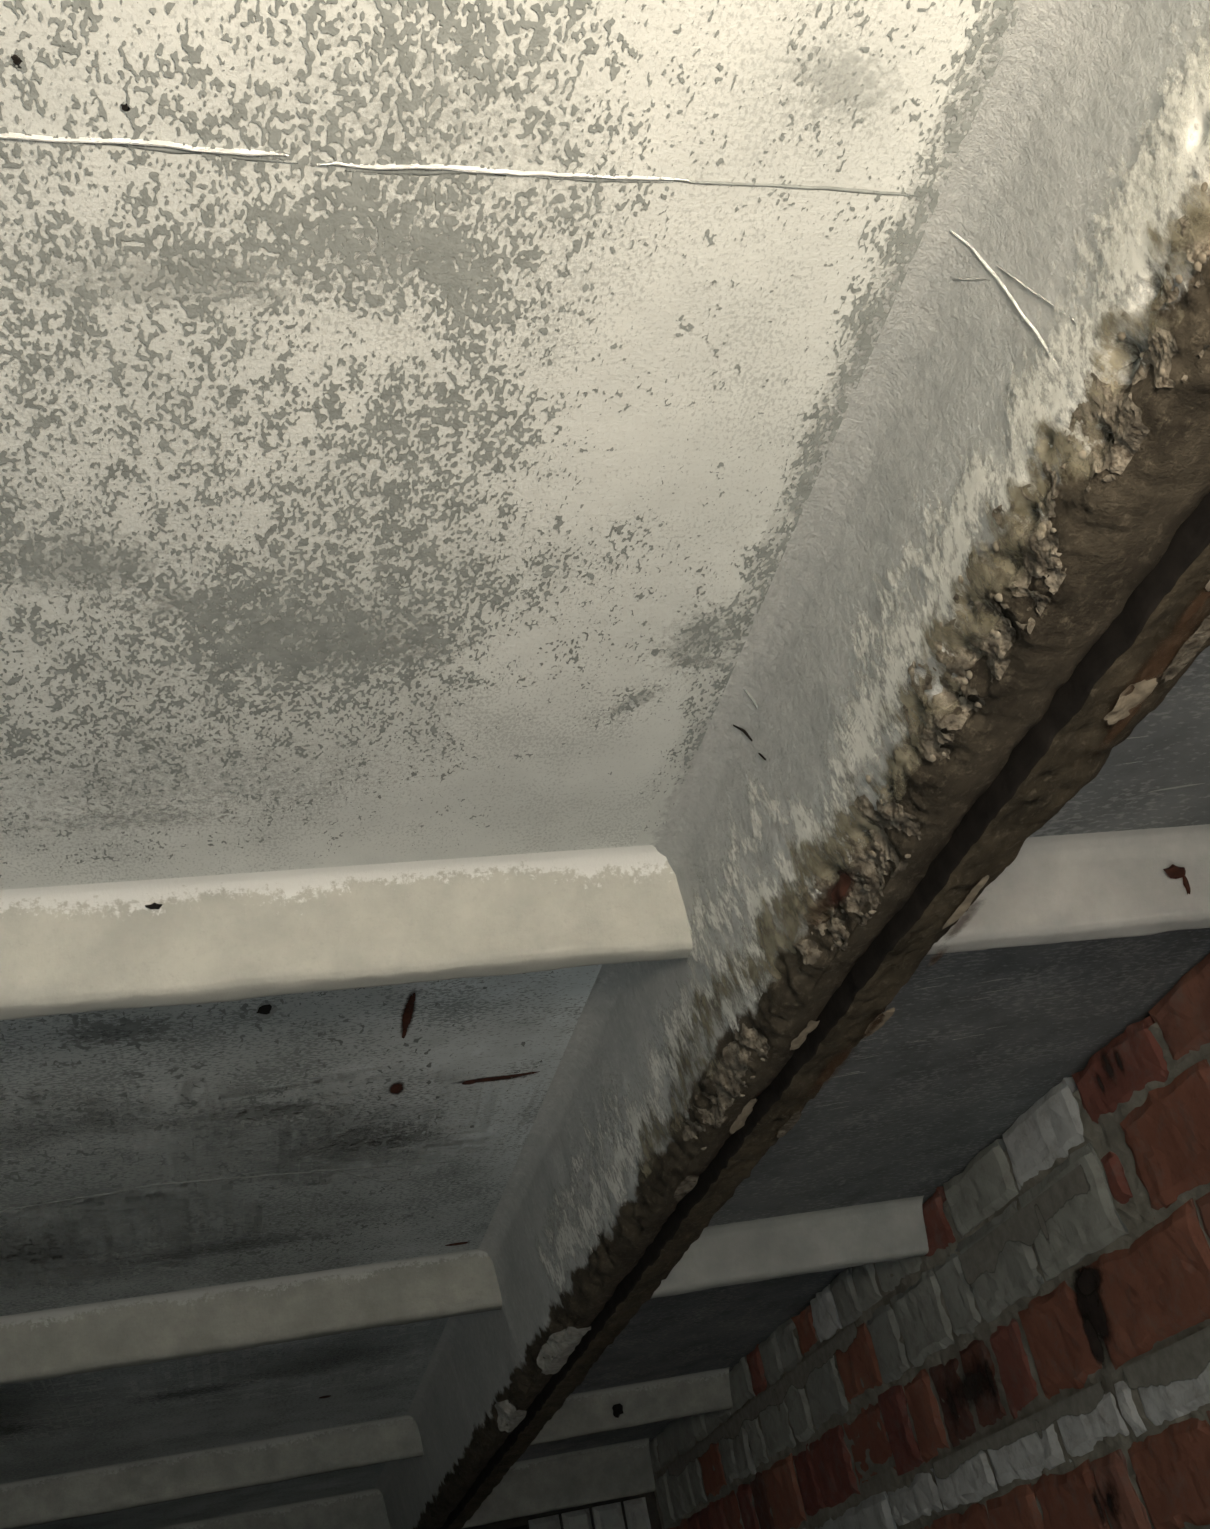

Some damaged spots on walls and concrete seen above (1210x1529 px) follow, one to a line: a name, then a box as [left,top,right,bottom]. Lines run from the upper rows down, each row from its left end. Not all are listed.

crack [0,132,917,197]
crack [950,230,1094,372]
spalling [899,182,1210,764]
leakage [536,23,1210,1297]
rust [811,871,854,916]
spalling [793,775,922,965]
rust [1163,864,1191,895]
rust [401,991,416,1038]
rust [458,1071,540,1085]
spalling [681,1023,770,1150]
spalling [537,1326,591,1375]
spalling [495,1400,527,1433]